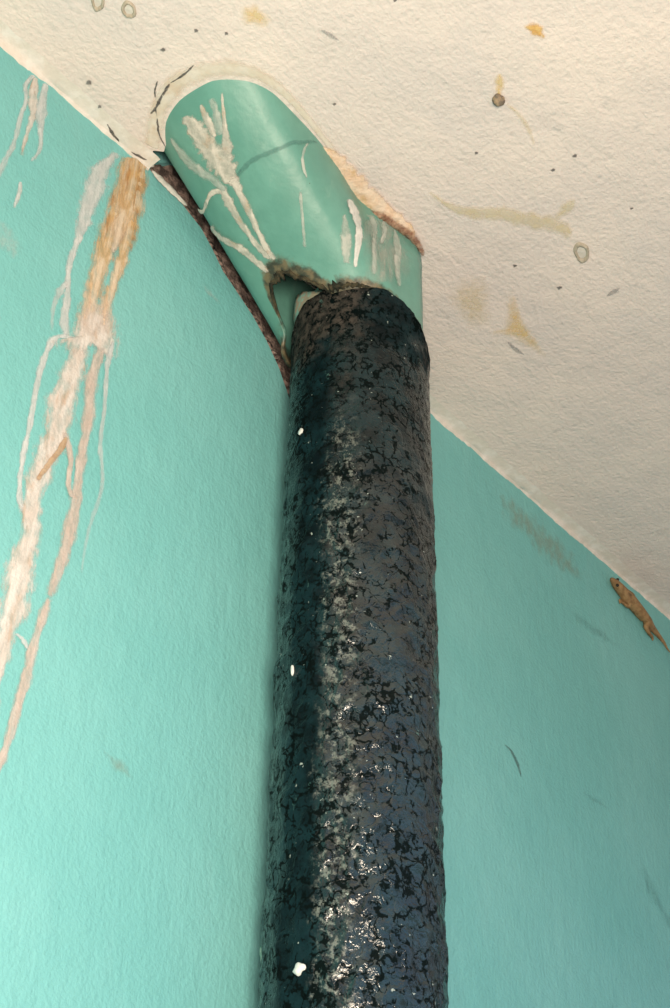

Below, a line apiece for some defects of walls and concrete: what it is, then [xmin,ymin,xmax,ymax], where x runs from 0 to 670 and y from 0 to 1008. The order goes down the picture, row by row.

leakage [7,75,48,158]
spalling [146,62,424,256]
leakage [341,199,401,286]
rust [0,152,147,769]